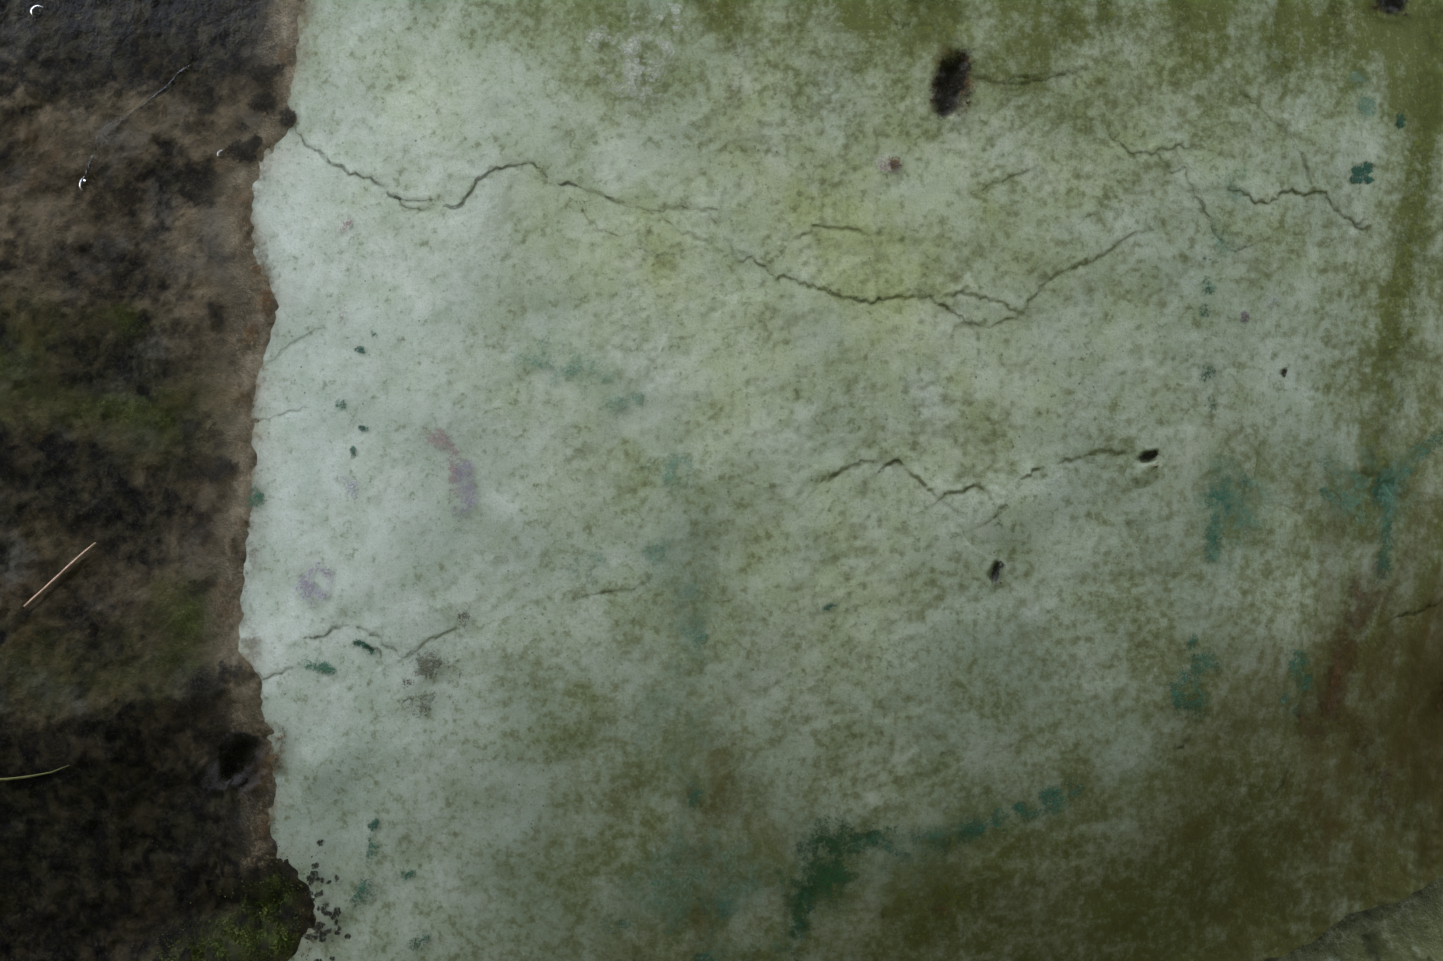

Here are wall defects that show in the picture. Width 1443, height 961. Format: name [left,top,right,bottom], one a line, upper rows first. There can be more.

spalling [929,46,974,118]